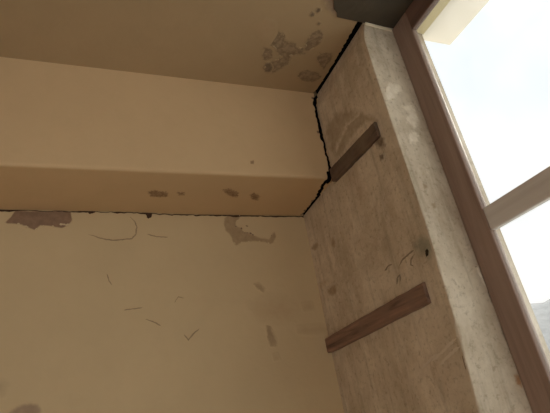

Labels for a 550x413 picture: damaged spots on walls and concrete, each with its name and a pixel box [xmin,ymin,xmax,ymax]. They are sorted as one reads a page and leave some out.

peeling [258,26,327,76]
crack [0,22,362,241]
spalling [4,210,74,232]
spalling [222,215,278,247]